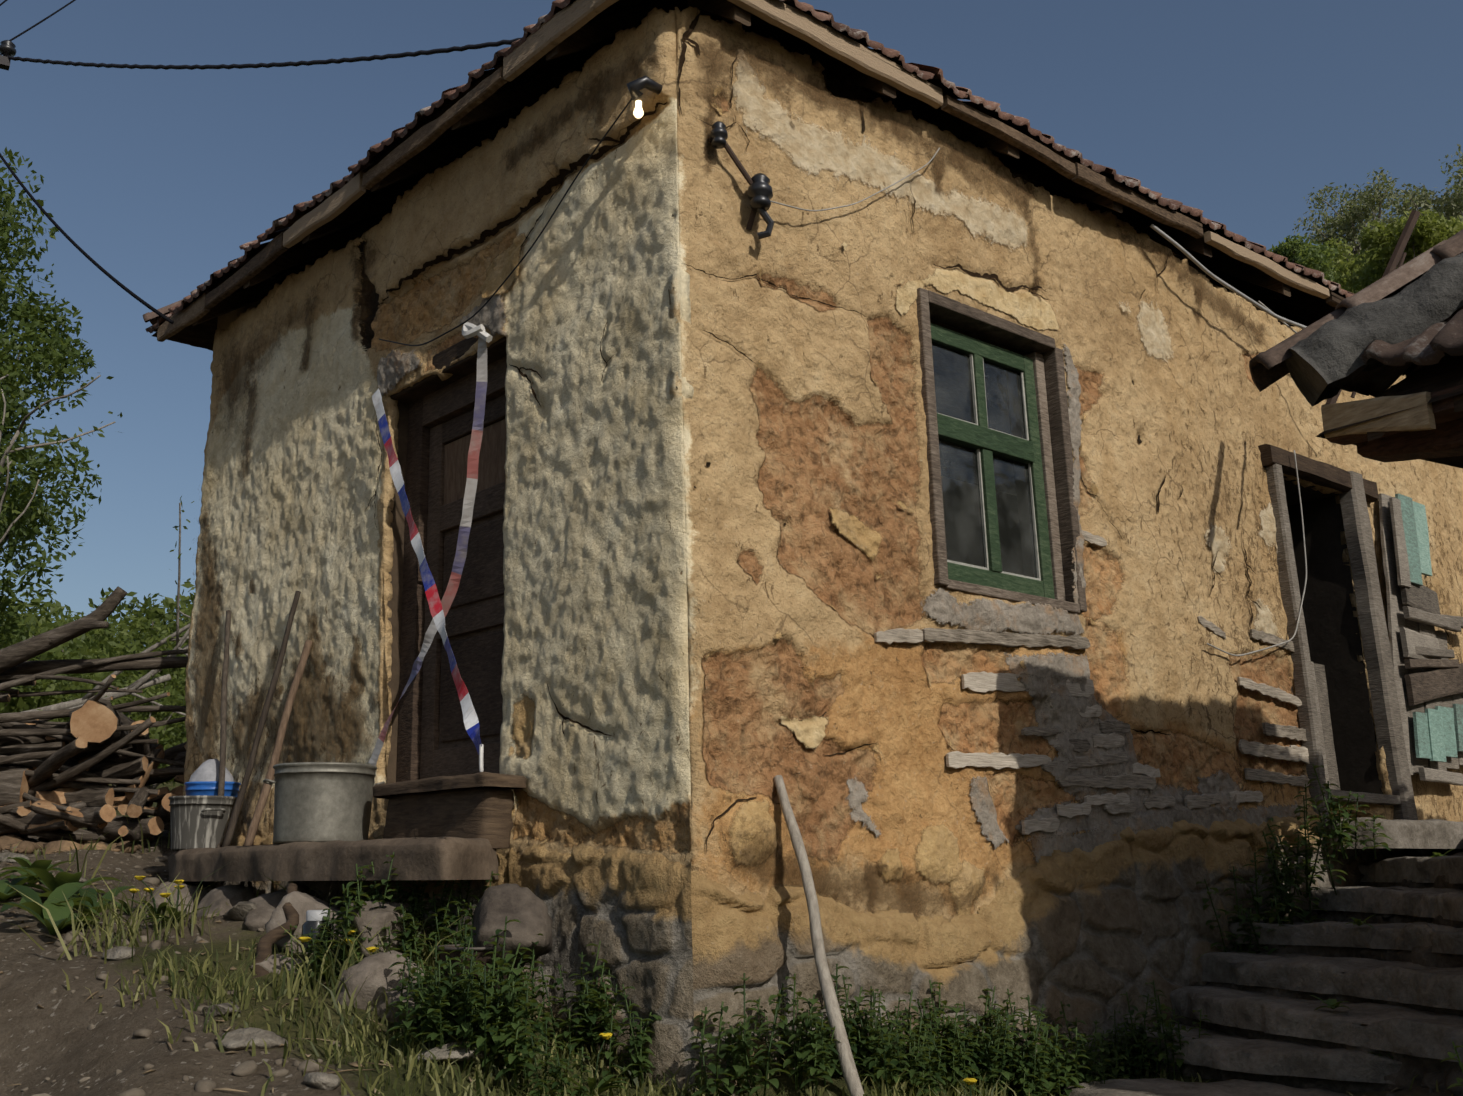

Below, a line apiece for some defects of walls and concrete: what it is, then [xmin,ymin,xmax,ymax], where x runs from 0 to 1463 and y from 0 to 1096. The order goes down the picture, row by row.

crack [377,12,750,306]
water stain [506,55,656,170]
peeling [733,56,1028,252]
water stain [216,297,317,472]
water stain [350,236,376,341]
crack [703,330,755,363]
crack [686,264,866,317]
flaking render [738,265,1059,636]
water stain [227,613,381,782]
flaking render [702,632,884,864]
flaking render [938,700,1076,847]
flaking render [1132,599,1305,807]